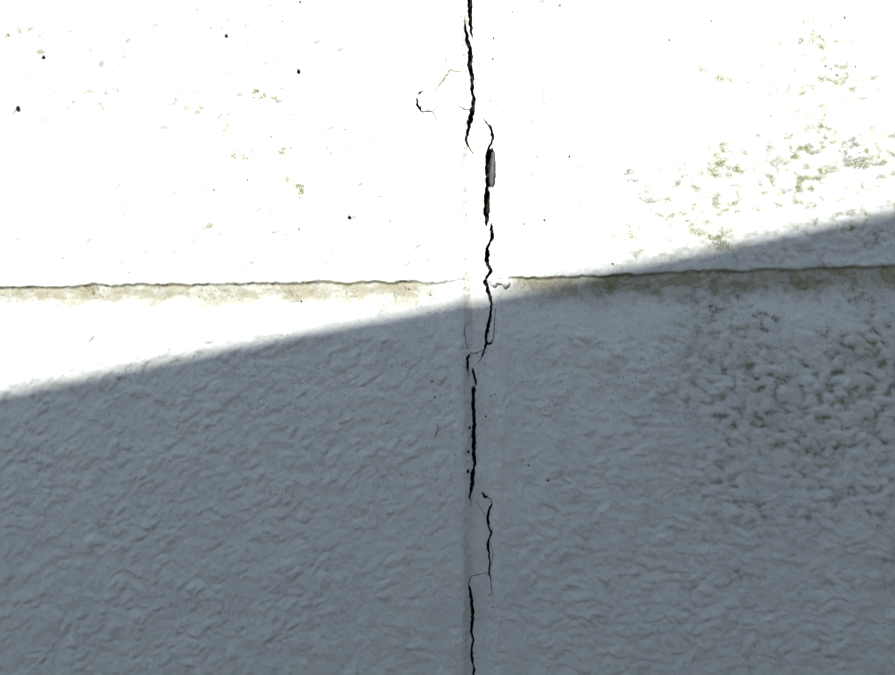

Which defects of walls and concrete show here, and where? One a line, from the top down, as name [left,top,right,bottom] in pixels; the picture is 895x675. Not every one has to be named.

crack [457,0,496,675]